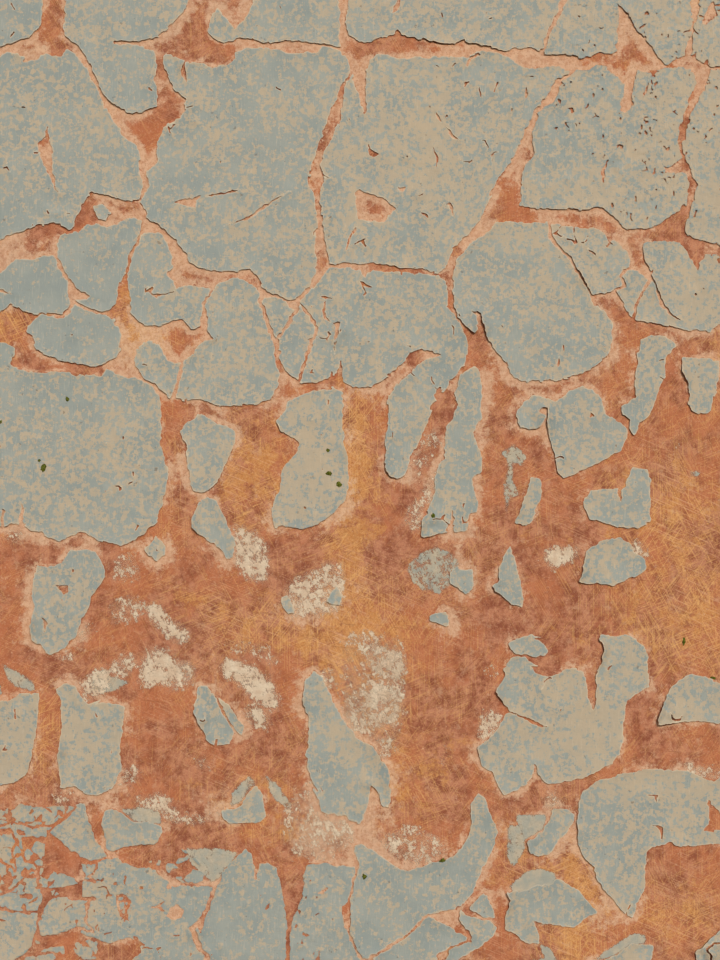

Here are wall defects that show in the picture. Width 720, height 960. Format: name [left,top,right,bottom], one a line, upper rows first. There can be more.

peeling [0,0,570,338]
peeling [519,0,720,245]
water stain [229,524,270,581]
water stain [282,563,345,618]
peeling [0,218,720,960]
water stain [80,597,195,702]
water stain [221,643,282,732]
water stain [320,629,408,759]
crack [0,873,141,960]
crack [189,875,222,960]
crack [255,851,328,960]
crack [349,914,432,960]